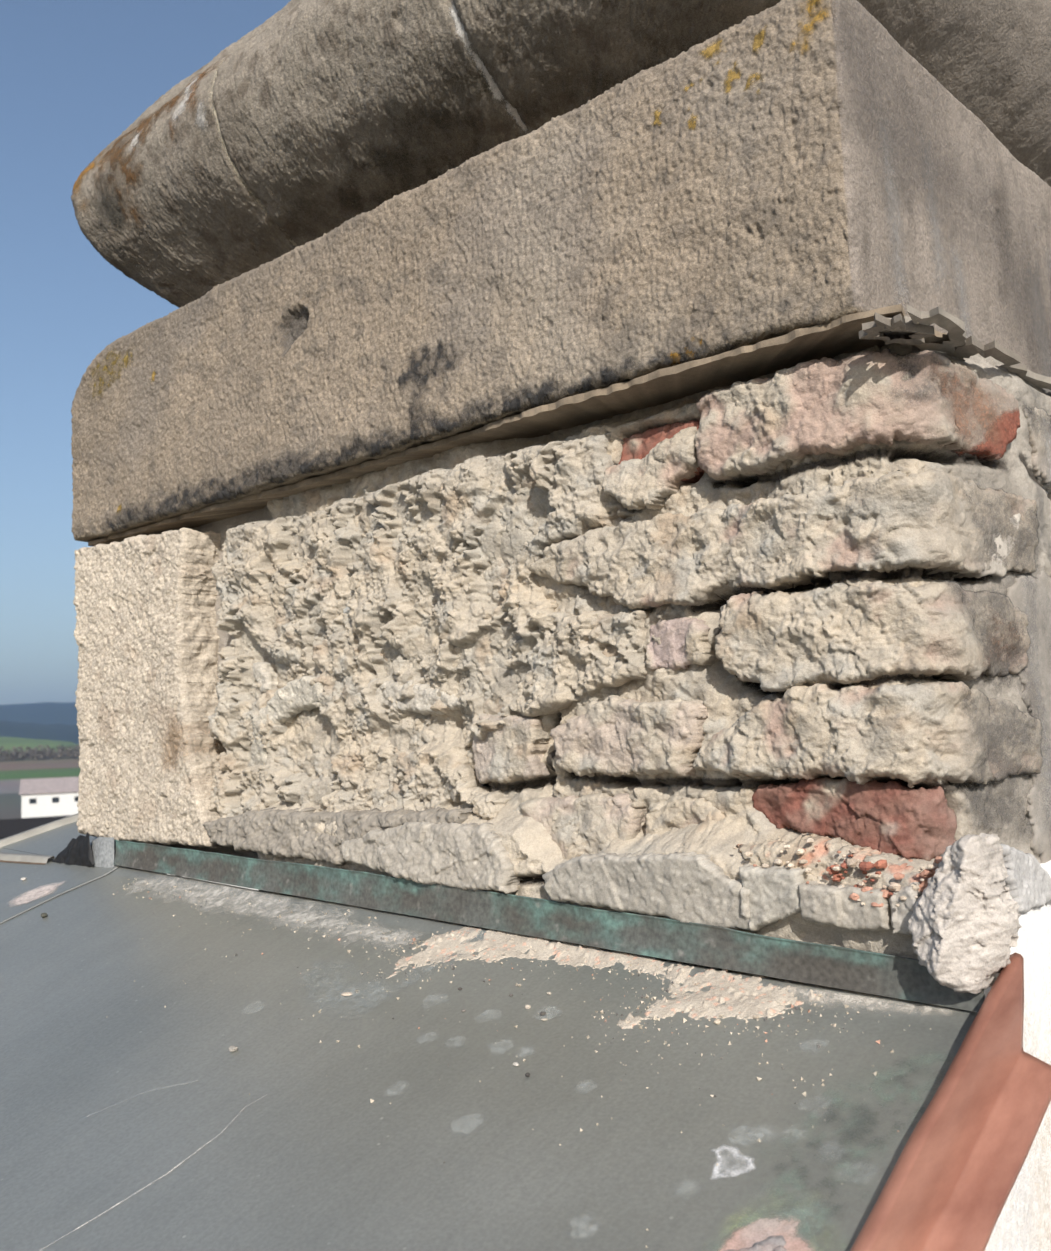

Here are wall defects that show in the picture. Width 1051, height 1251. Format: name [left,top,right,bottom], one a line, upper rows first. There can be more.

spalling [202,432,651,894]
peeling [542,833,943,935]
rust [720,1209,815,1251]